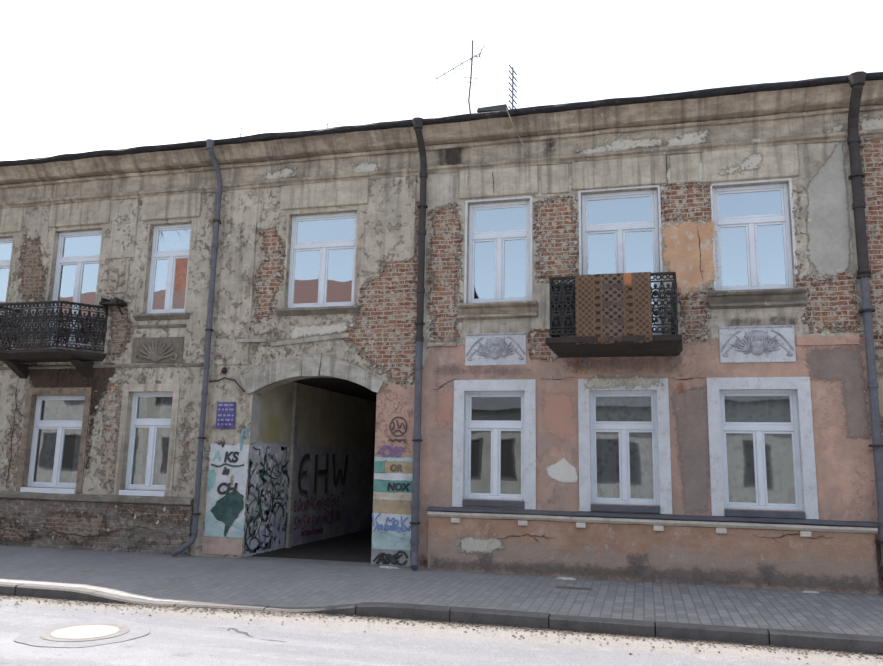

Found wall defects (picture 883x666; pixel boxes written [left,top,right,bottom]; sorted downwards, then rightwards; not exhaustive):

peeling [576,130,710,161]
spalling [248,201,464,385]
spalling [532,194,579,285]
peeling [657,158,719,343]
spalling [791,138,883,445]
spalling [457,533,505,555]
crack [754,533,833,543]